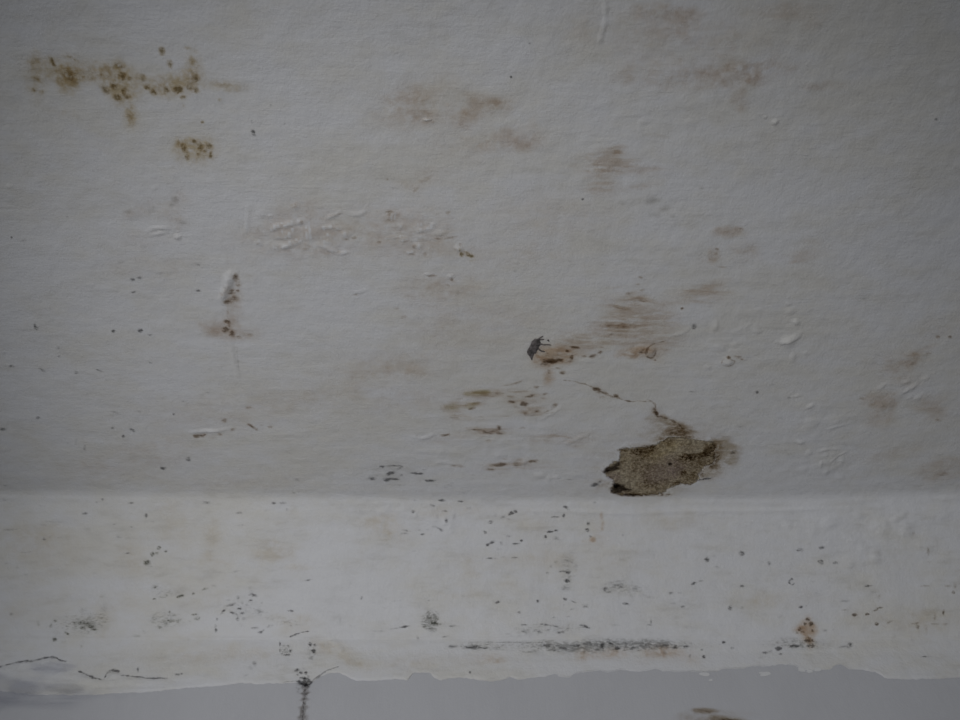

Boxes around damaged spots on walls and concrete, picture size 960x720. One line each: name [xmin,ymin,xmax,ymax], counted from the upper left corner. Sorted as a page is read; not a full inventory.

peeling [593,428,725,505]